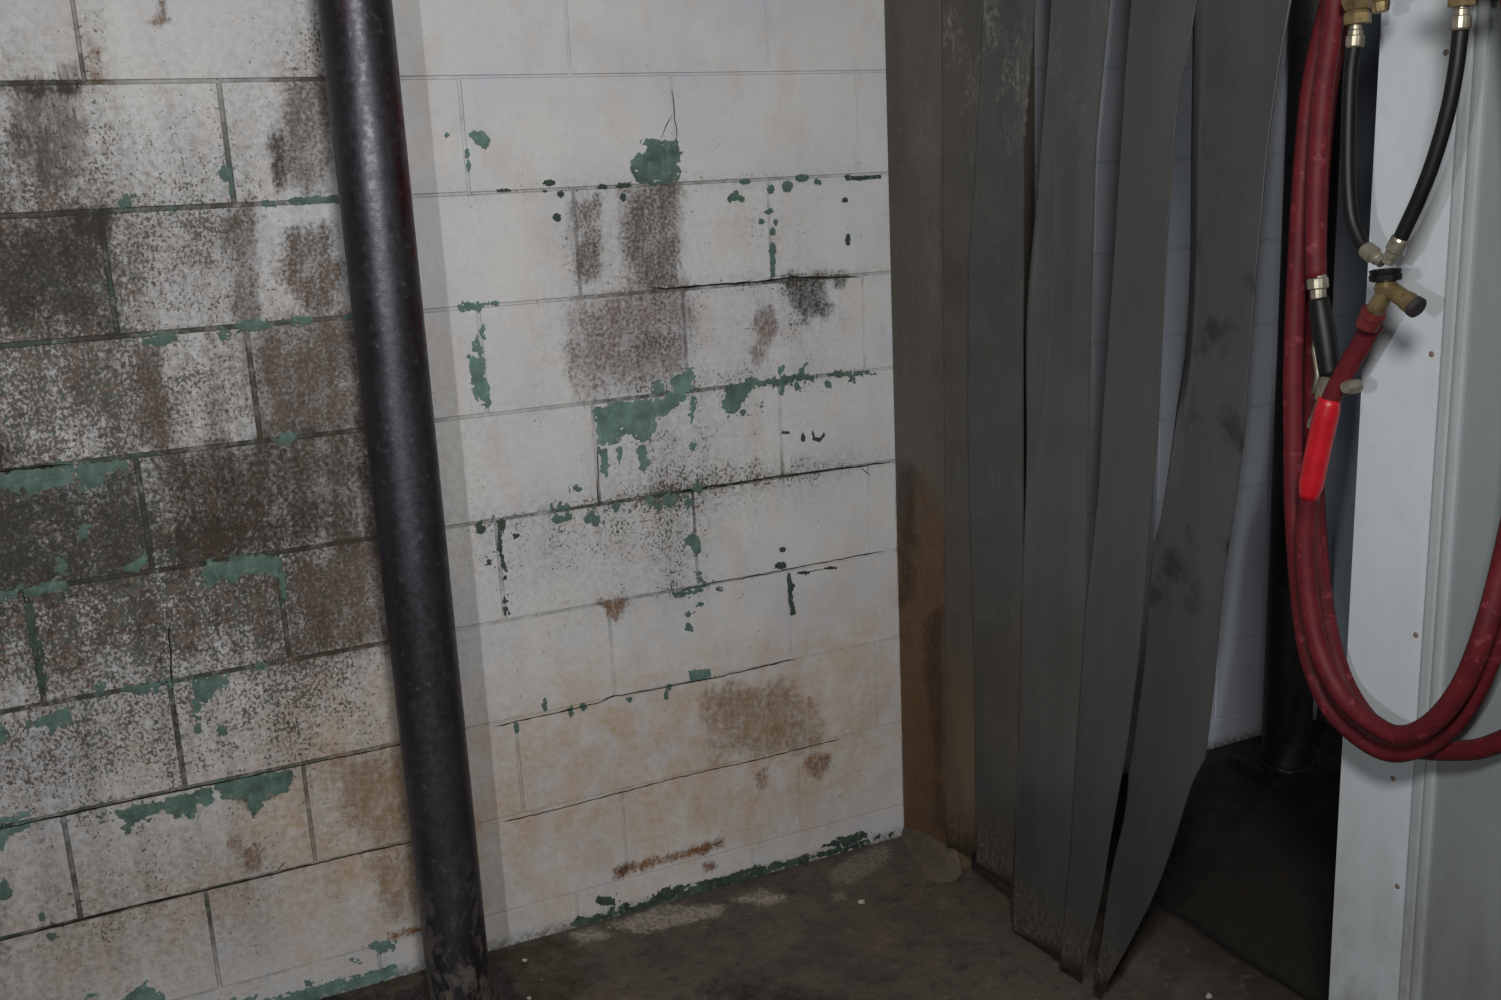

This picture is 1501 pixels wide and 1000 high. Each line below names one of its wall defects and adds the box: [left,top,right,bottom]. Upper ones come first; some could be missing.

damp [0,75,83,187]
damp [270,77,330,193]
peeling [598,133,683,202]
damp [569,182,691,389]
damp [786,273,846,321]
damp [0,205,389,669]
peeling [457,300,499,408]
peeling [592,367,697,477]
peeling [721,362,877,418]
peeling [97,767,295,835]
corrosion [614,841,722,878]
peeling [563,827,897,928]